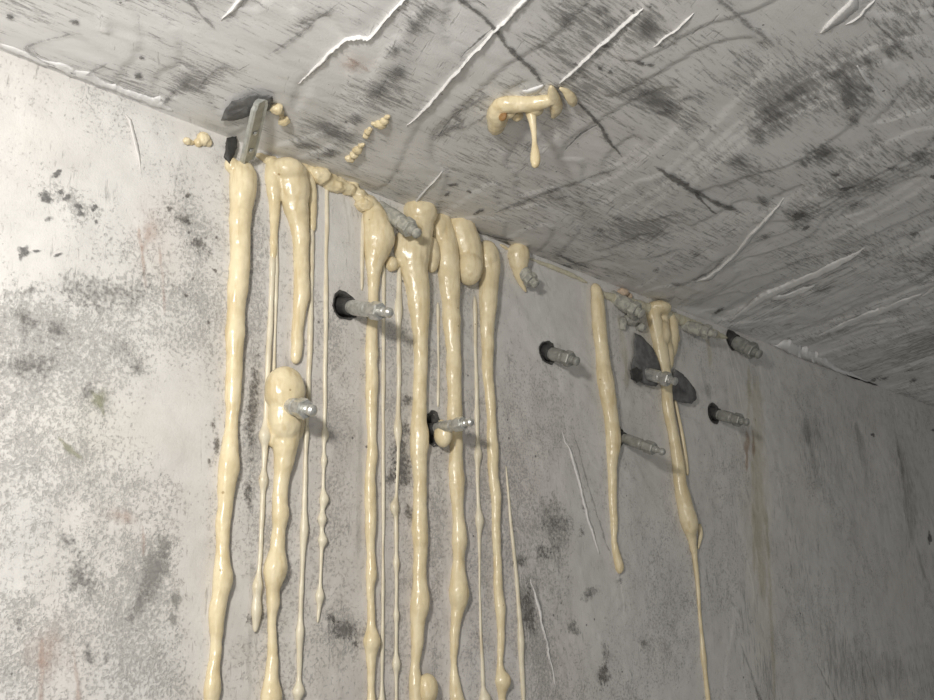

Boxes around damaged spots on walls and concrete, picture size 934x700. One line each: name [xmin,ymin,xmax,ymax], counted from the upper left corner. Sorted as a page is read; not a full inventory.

crack [458,0,544,85]
crack [566,103,620,154]
crack [657,168,737,214]